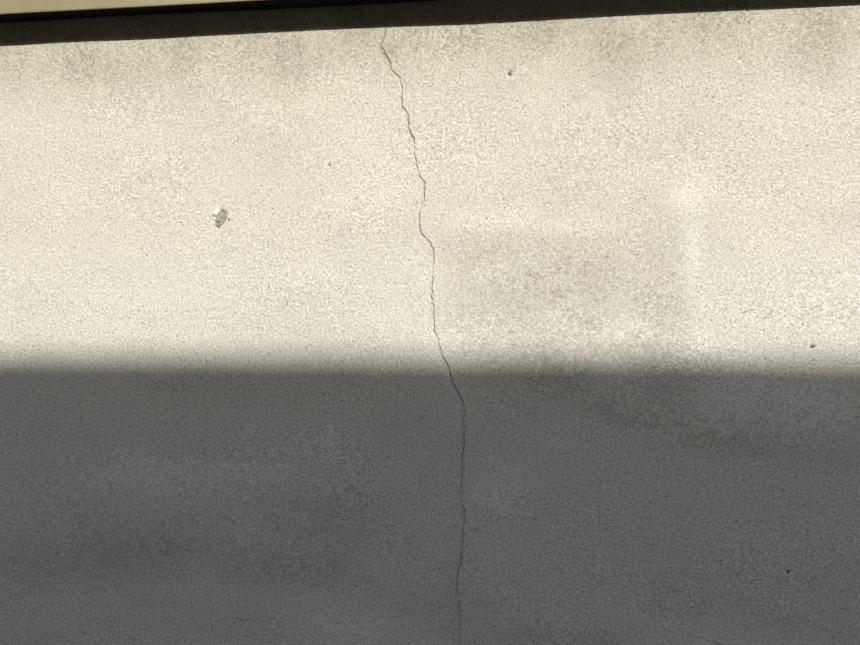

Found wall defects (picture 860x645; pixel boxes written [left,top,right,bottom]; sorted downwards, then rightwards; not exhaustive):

crack [381,4,466,639]